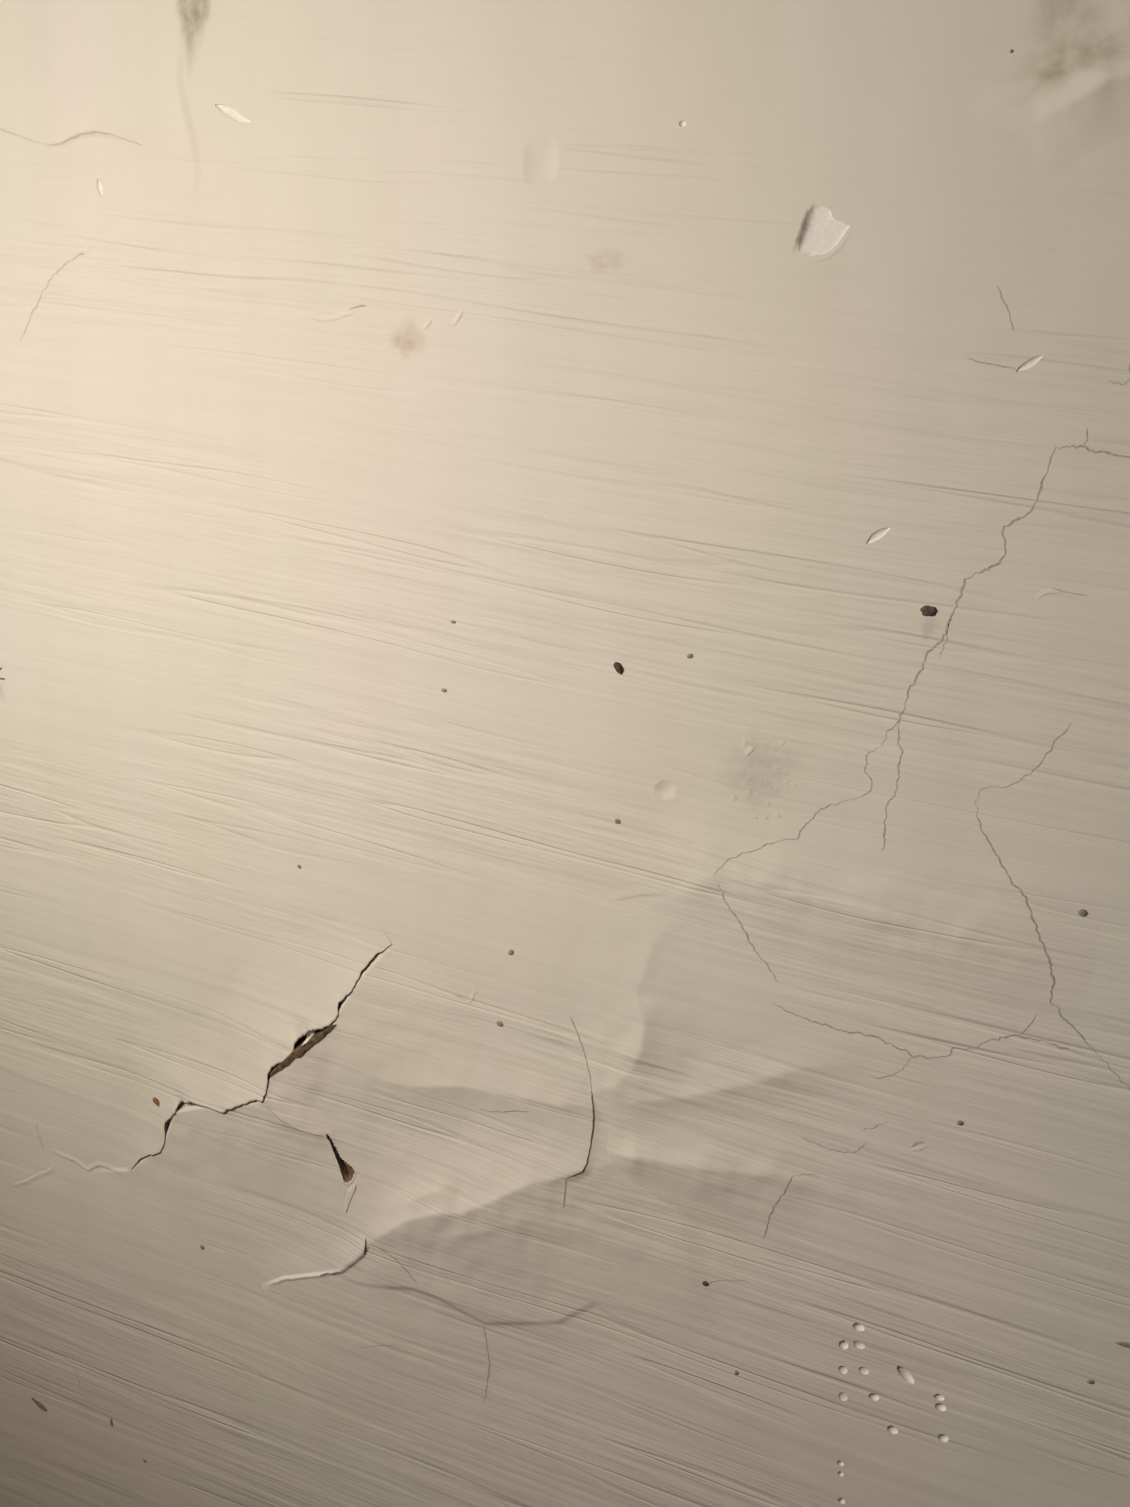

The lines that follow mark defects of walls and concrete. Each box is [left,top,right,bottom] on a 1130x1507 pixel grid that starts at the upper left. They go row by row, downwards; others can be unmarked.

peeling [798,205,851,263]
crack [713,428,1130,1090]
crack [763,1122,887,1237]
crack [482,1323,490,1399]